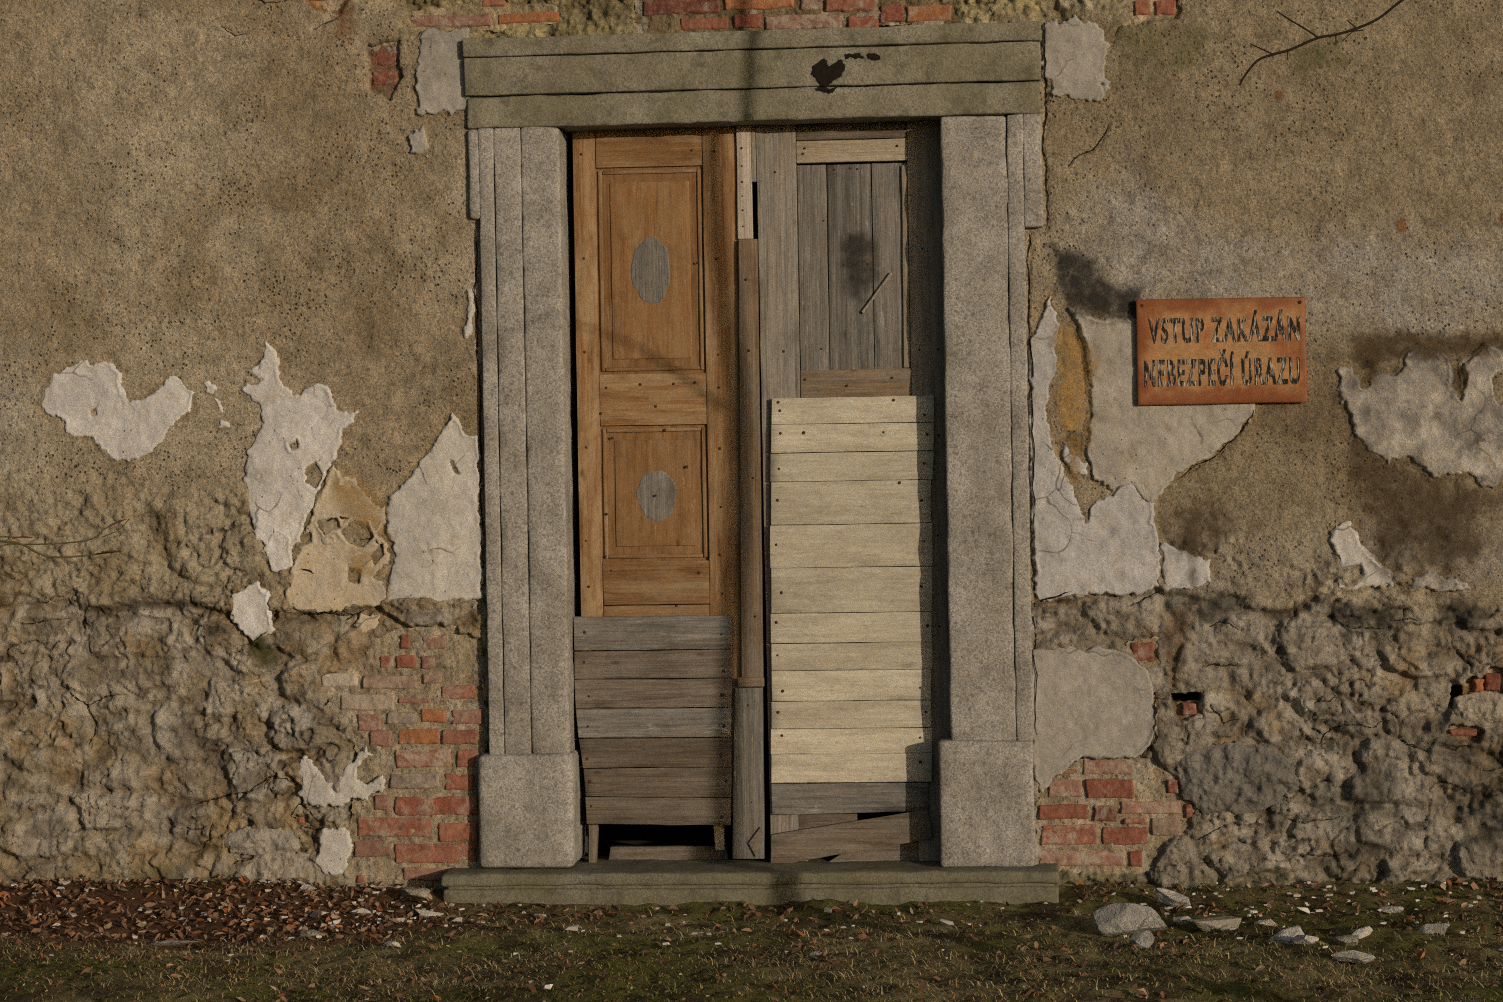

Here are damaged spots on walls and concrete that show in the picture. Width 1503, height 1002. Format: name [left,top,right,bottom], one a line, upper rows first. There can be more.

spalling [368,0,563,101]
spalling [631,0,961,34]
spalling [1121,0,1181,26]
flaking render [463,288,476,339]
flaking render [1028,296,1256,602]
flaking render [1336,346,1503,489]
flaking render [1329,521,1471,592]
spalling [230,341,487,888]
spalling [1126,636,1160,669]
spalling [1171,692,1201,719]
spalling [1444,666,1503,741]
spalling [1036,758,1194,874]